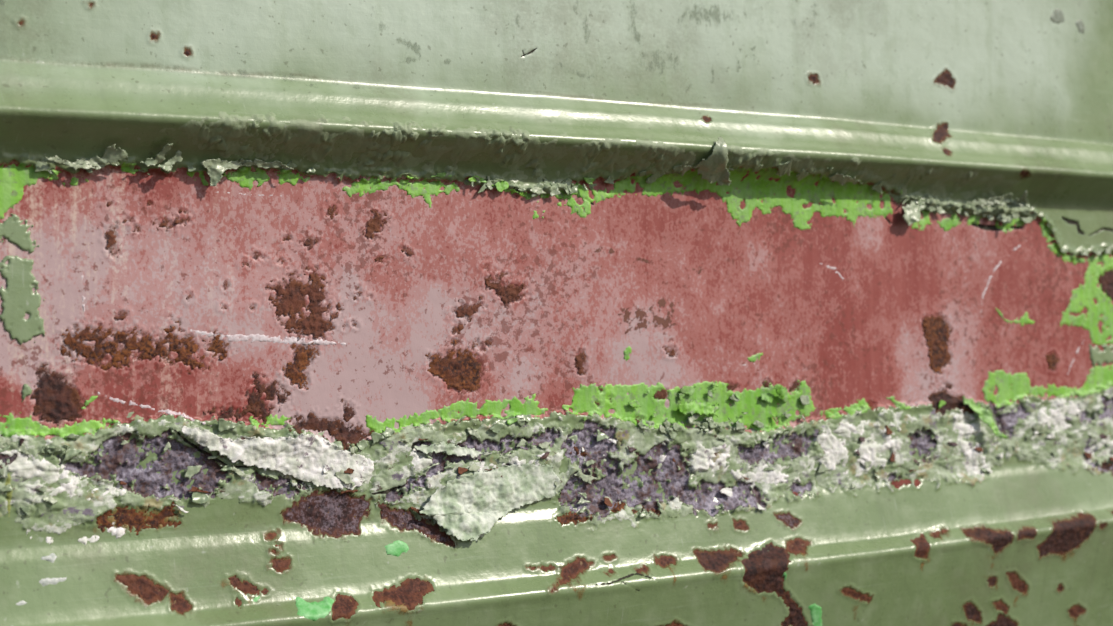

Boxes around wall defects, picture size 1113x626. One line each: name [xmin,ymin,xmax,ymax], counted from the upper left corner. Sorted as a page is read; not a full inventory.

corrosion [31,364,87,426]
corrosion [60,311,229,374]
corrosion [203,258,375,450]
corrosion [425,266,526,393]
peeling [0,137,1113,563]
corrosion [923,315,978,416]
peeling [39,577,67,586]
corrosion [115,574,193,615]
corrosion [264,487,457,573]
corrosion [372,578,434,626]
corrosion [693,512,811,626]
corrosion [910,511,1113,571]